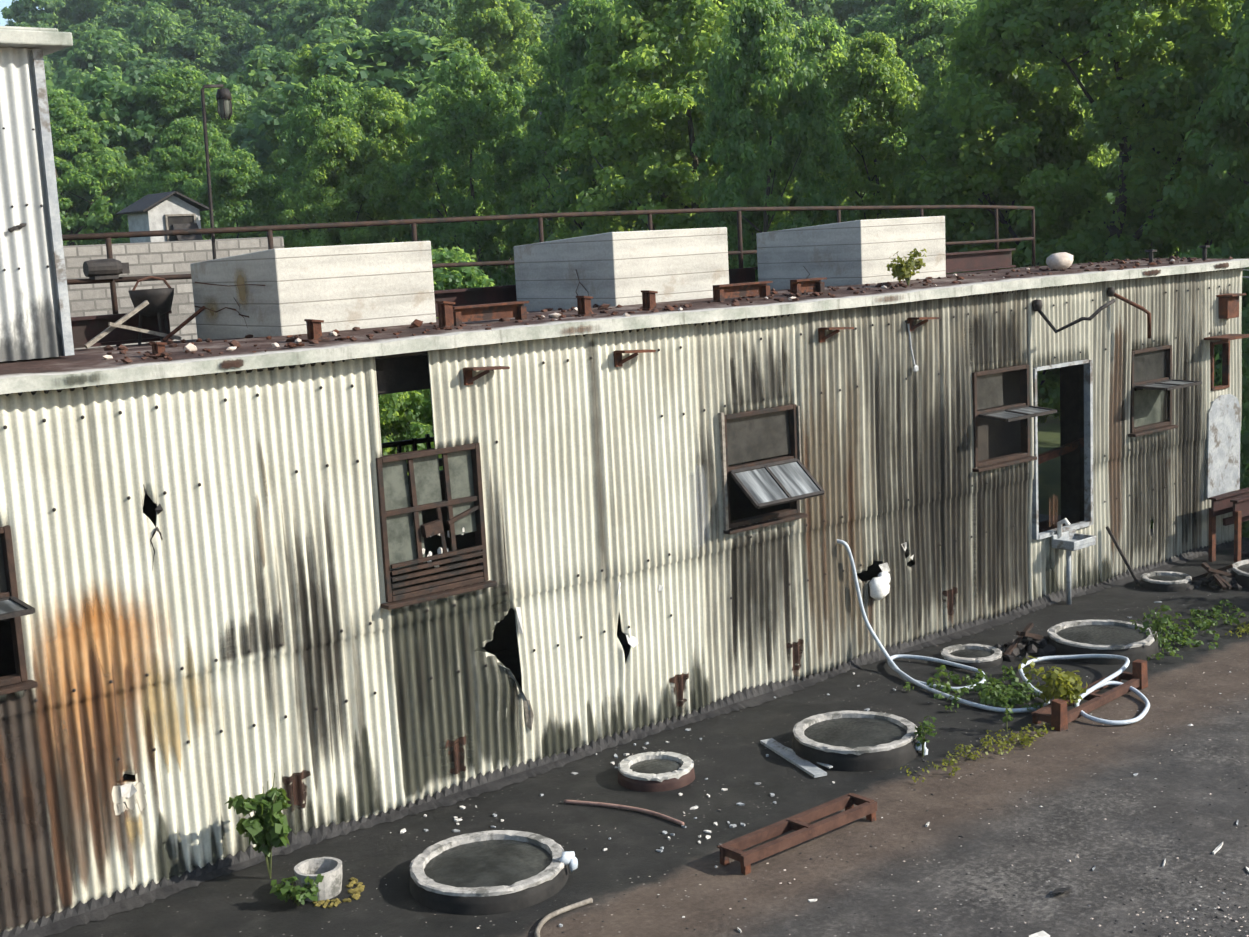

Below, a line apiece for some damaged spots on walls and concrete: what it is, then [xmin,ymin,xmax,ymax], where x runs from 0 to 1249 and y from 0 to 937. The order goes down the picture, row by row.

leakage [696,437,719,549]
leakage [803,360,1029,658]
leakage [1126,320,1201,562]
leakage [255,452,378,816]
peeling [515,607,523,634]
leakage [731,525,793,669]
leakage [1046,552,1055,596]
leakage [1077,552,1087,588]
corrosion [669,673,689,712]
corrosion [34,593,199,906]
leakage [282,782,308,837]
corrosion [282,770,311,818]